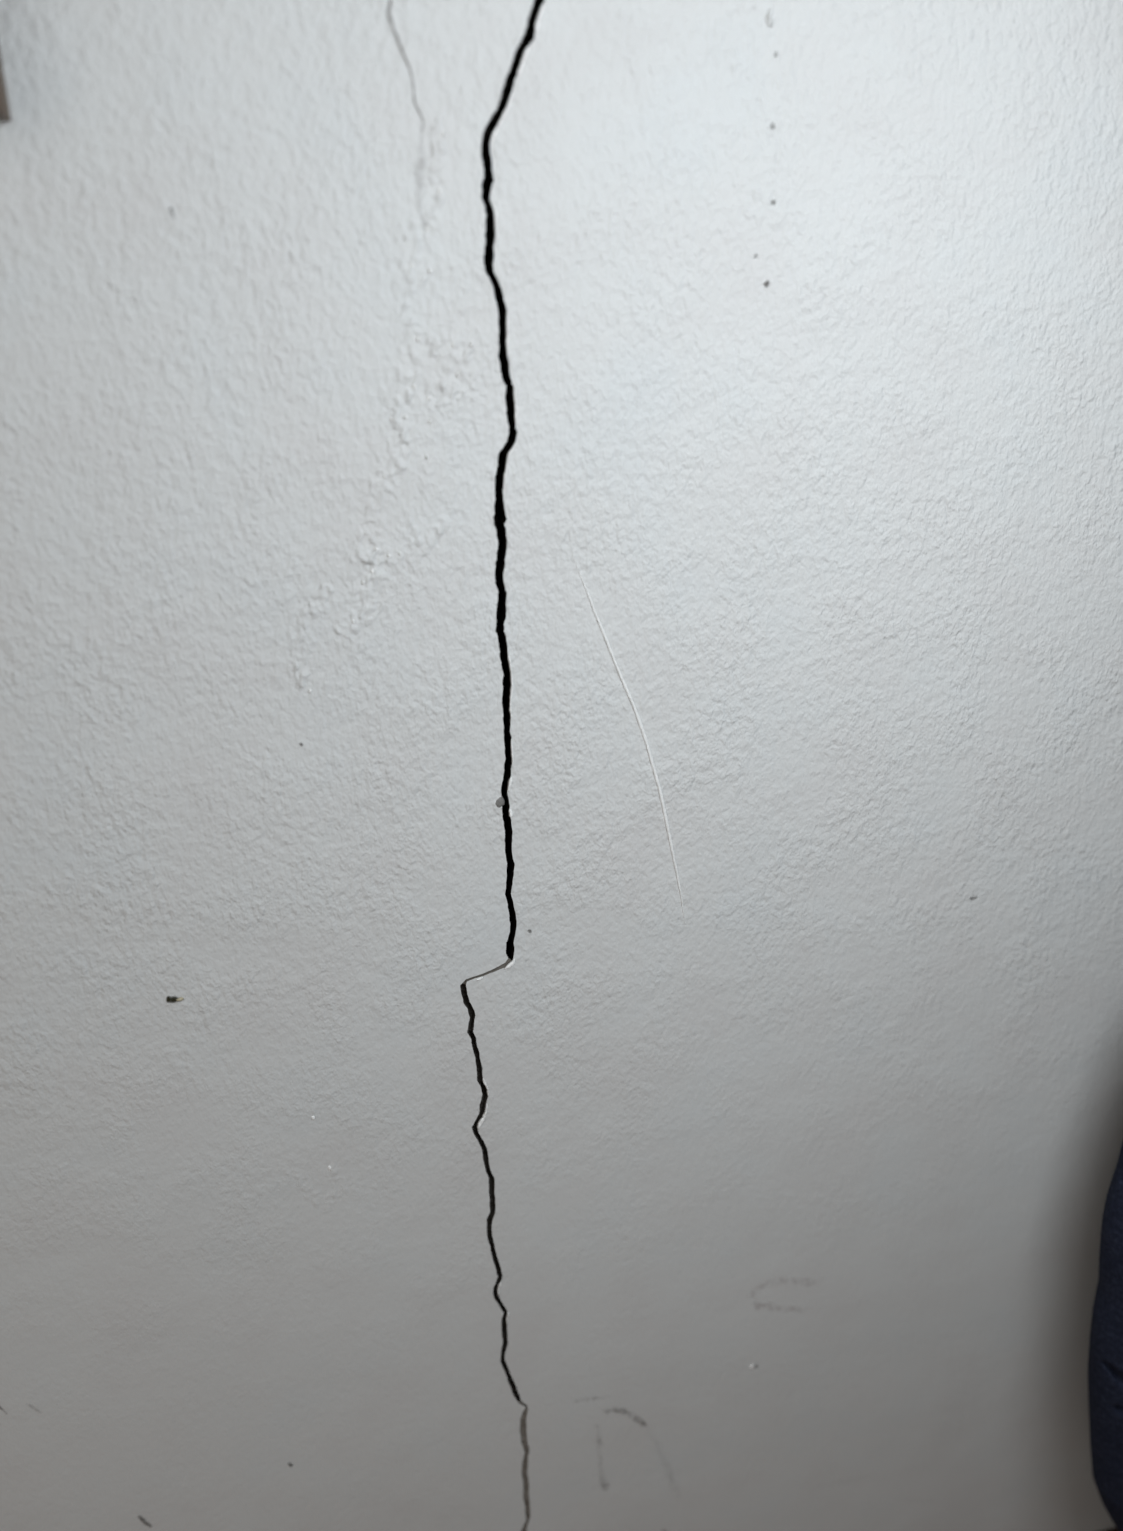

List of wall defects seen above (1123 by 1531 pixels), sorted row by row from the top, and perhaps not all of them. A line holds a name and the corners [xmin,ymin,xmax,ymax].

crack [460,0,545,1531]